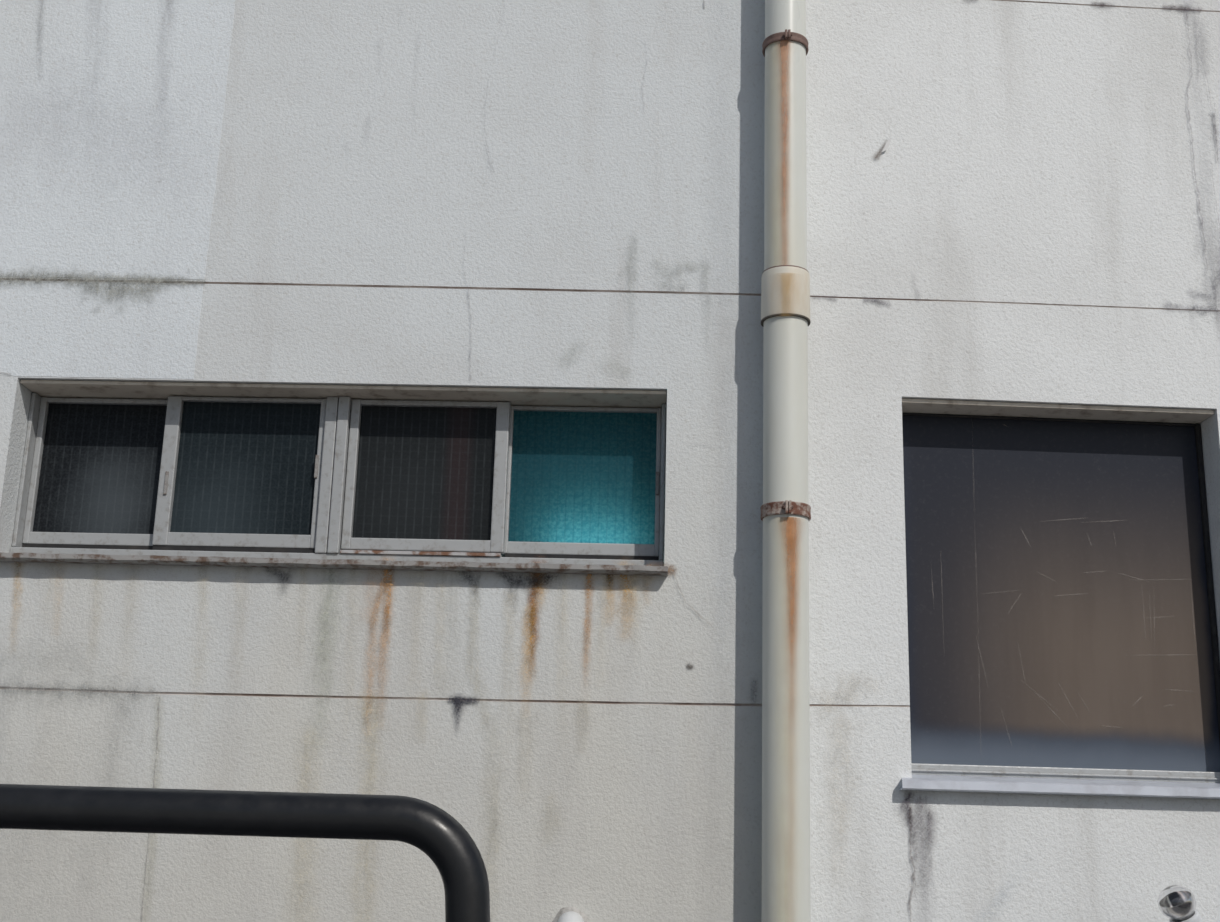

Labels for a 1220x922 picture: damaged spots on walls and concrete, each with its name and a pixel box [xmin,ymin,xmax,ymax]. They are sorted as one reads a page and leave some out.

rust [781,40,789,204]
mould [0,272,203,299]
rust [529,573,540,648]
rust [786,517,797,644]
leakage [902,793,932,836]